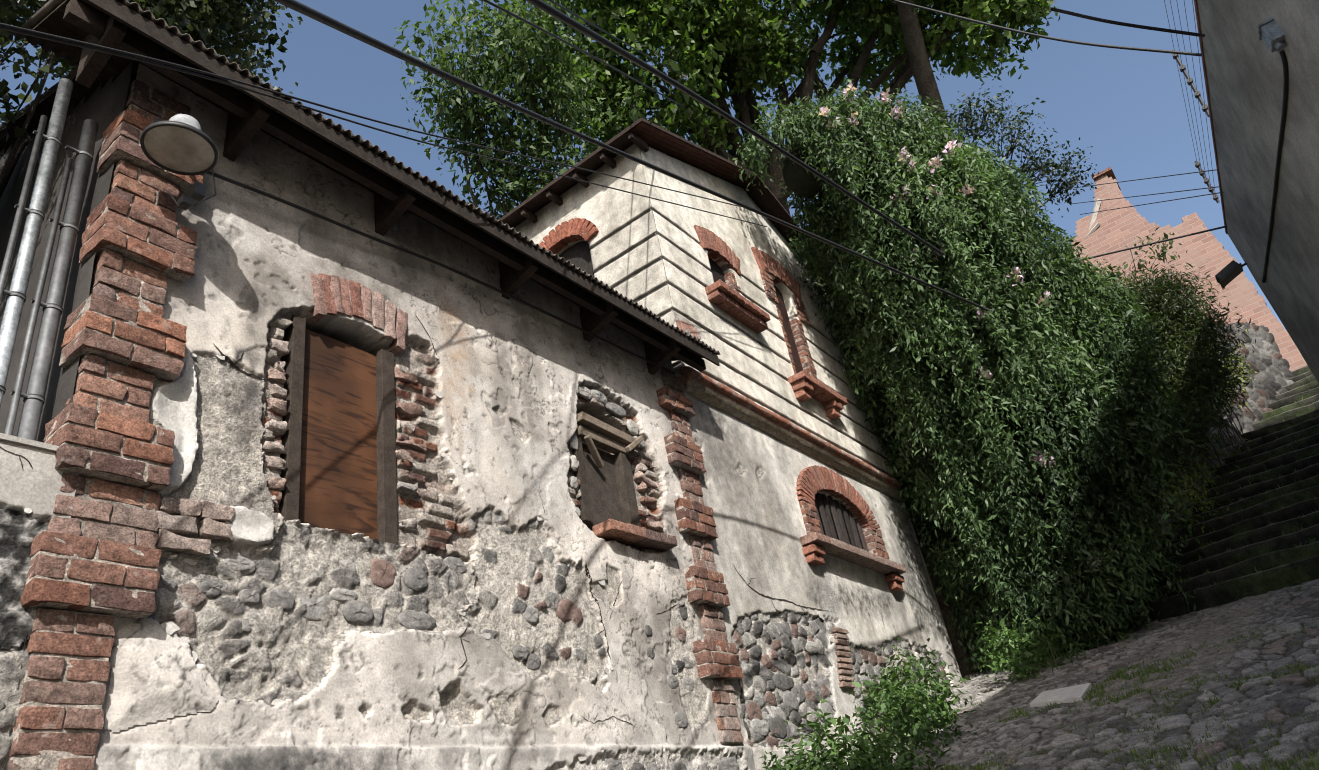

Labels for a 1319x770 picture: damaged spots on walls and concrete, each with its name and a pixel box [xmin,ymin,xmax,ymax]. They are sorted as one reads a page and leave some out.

flaking render [149,309,622,706]
spalling [401,683,477,726]